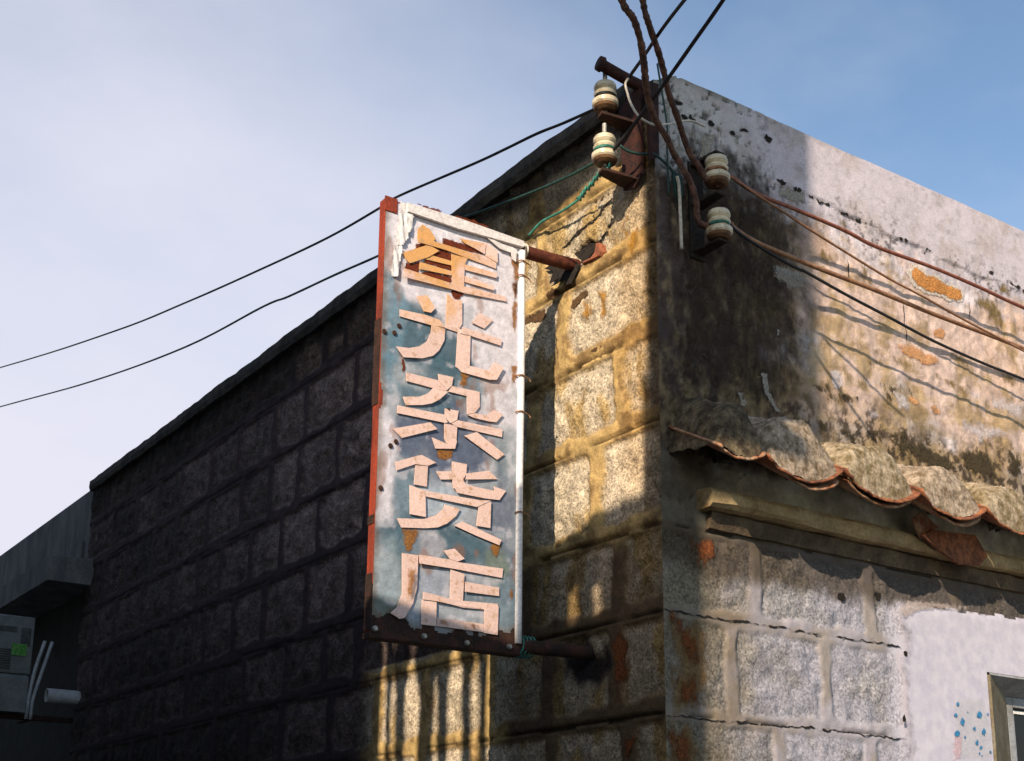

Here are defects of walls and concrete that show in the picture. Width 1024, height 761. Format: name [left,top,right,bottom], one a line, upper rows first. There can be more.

crack [562,197,615,248]
damp [678,132,795,412]
peeling [906,264,965,303]
crack [665,608,899,647]
rust [611,631,630,683]
rust [670,611,706,710]
crack [668,715,905,740]